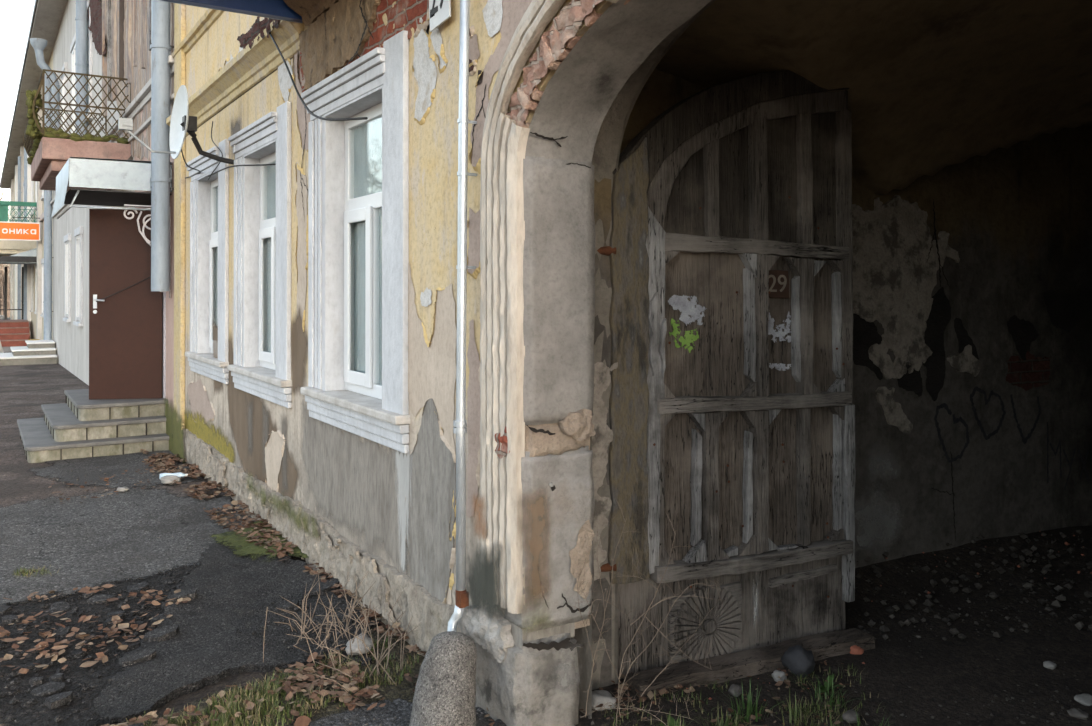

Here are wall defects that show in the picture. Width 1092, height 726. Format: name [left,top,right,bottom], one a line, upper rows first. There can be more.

spalling [277,0,448,152]
peeling [469,0,532,174]
spalling [506,0,603,128]
crack [530,132,591,168]
peeling [295,162,308,332]
peeling [467,207,480,279]
peeling [852,195,983,434]
spalling [201,430,397,635]
peeling [408,263,481,605]
spalling [495,427,510,459]
peeling [558,362,618,599]
crack [523,593,593,651]